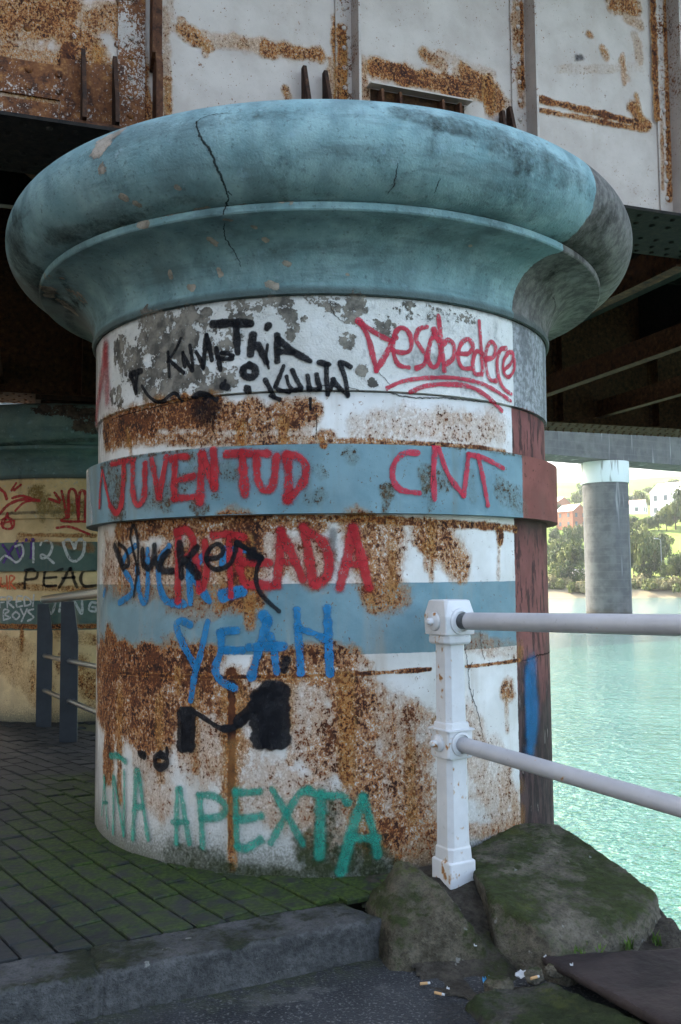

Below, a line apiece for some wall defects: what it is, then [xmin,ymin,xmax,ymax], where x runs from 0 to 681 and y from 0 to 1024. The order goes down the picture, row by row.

corrosion [0,0,118,66]
corrosion [163,2,348,99]
corrosion [361,1,526,116]
corrosion [539,0,673,202]
crack [196,113,241,267]
peeling [109,280,476,411]
corrosion [0,390,522,630]
corrosion [0,623,37,708]
corrosion [77,623,437,871]
crack [465,634,485,740]
corrosion [467,759,522,841]
corrosion [501,679,516,713]